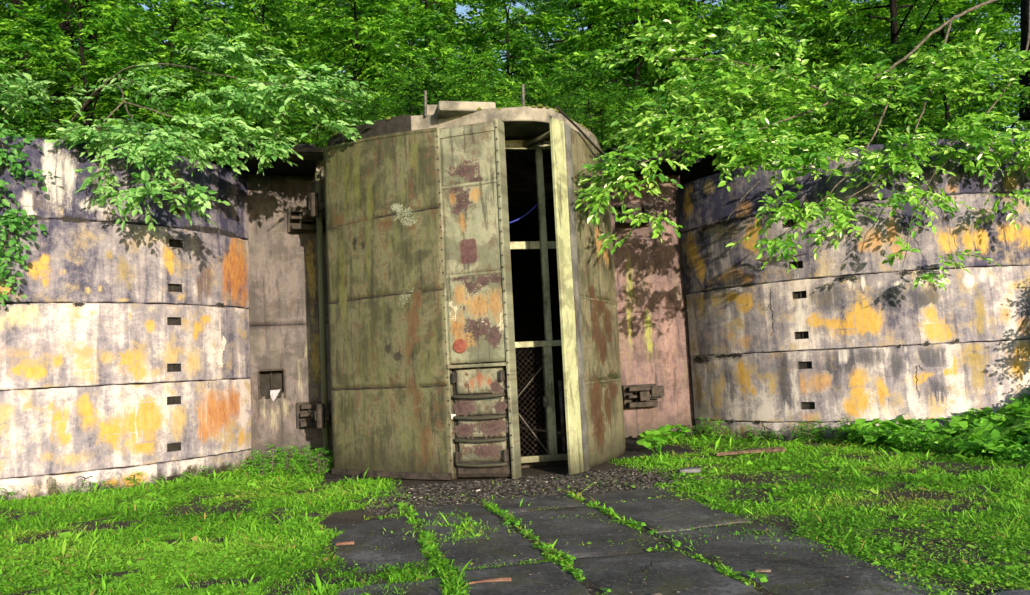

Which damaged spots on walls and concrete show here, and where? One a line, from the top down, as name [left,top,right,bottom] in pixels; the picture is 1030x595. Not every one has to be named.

rust [448,180,483,236]
rust [403,287,425,375]
leakage [624,240,655,372]
leakage [681,176,762,350]
leakage [692,217,1030,440]
rust [190,380,243,454]
rust [468,367,494,396]